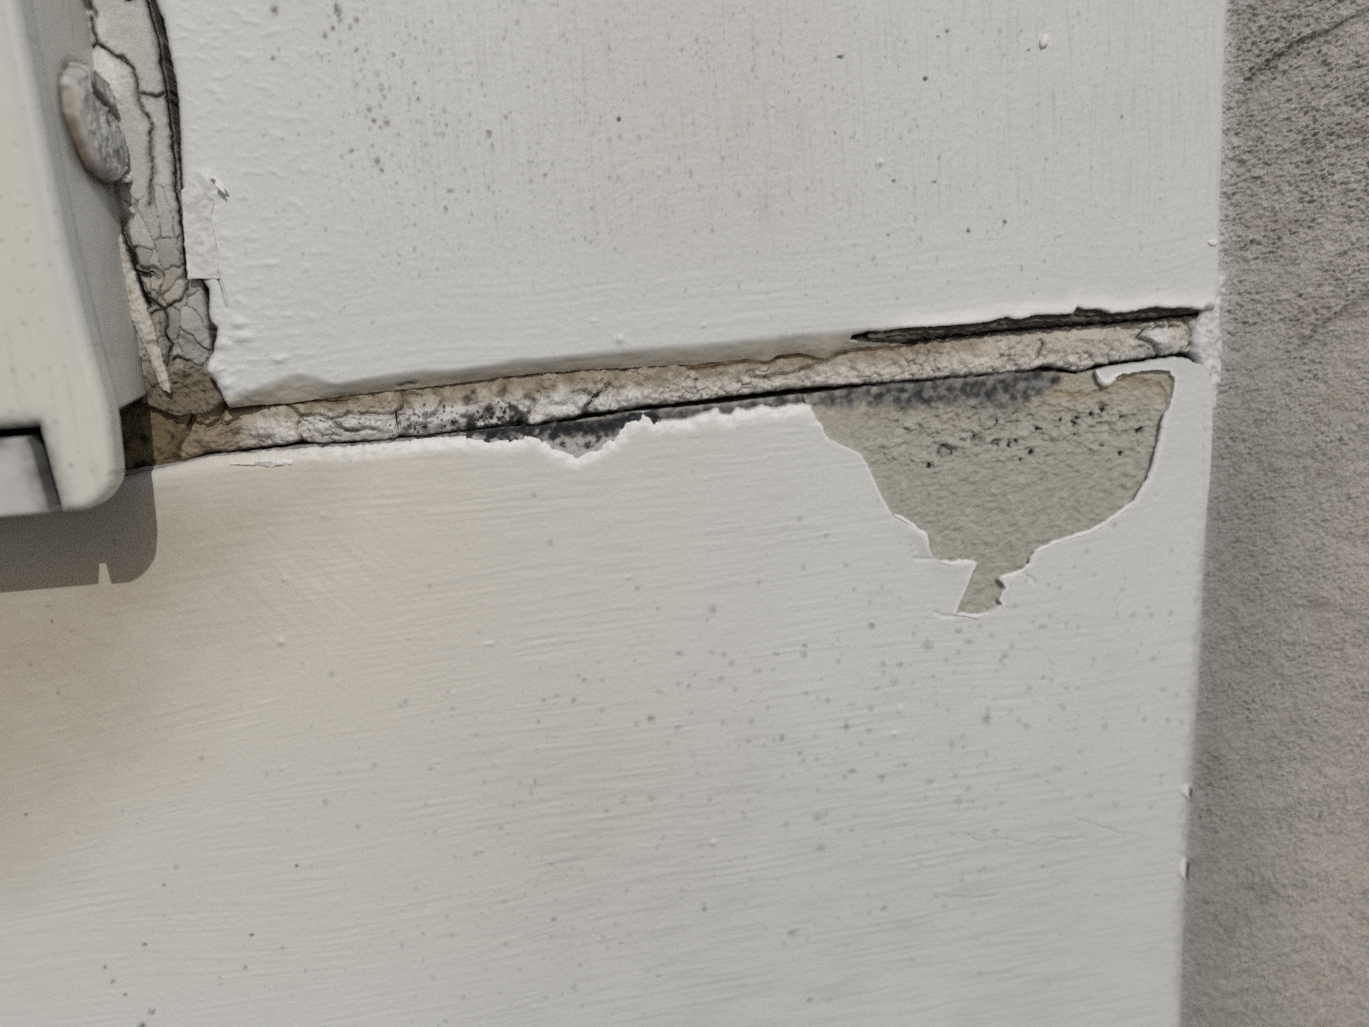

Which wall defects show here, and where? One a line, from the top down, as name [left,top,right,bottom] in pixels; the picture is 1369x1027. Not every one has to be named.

crack [90,0,227,368]
peeling [466,411,661,459]
crack [177,312,1199,460]
peeling [802,370,1172,619]